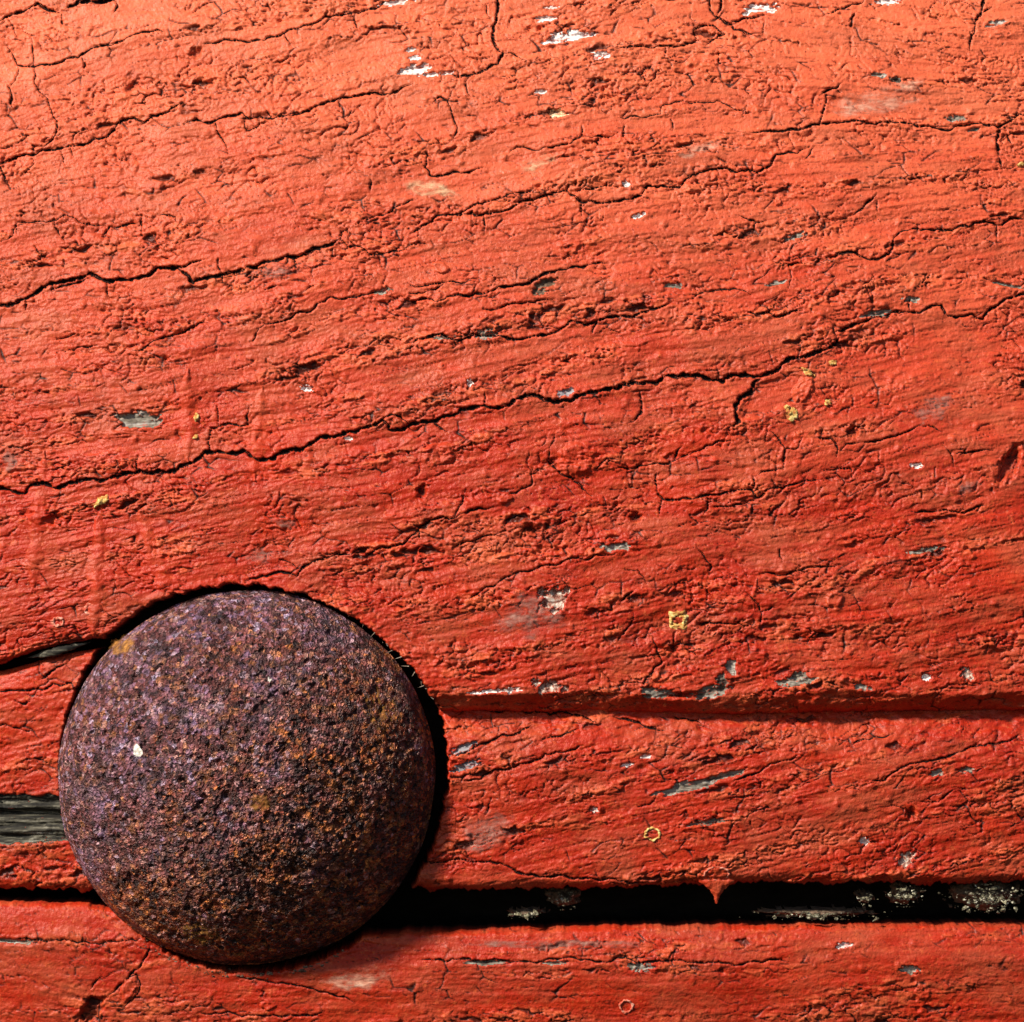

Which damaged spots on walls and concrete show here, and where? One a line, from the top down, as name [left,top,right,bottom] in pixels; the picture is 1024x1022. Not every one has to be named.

crack [0,0,413,185]
peeling [398,47,454,77]
crack [434,0,527,141]
peeling [535,6,598,46]
crack [614,0,765,64]
crack [0,83,1024,310]
crack [253,262,666,343]
peeling [113,410,163,428]
crack [0,293,1024,582]
rust [112,639,133,654]
peeling [640,660,736,700]
peeling [651,770,743,797]